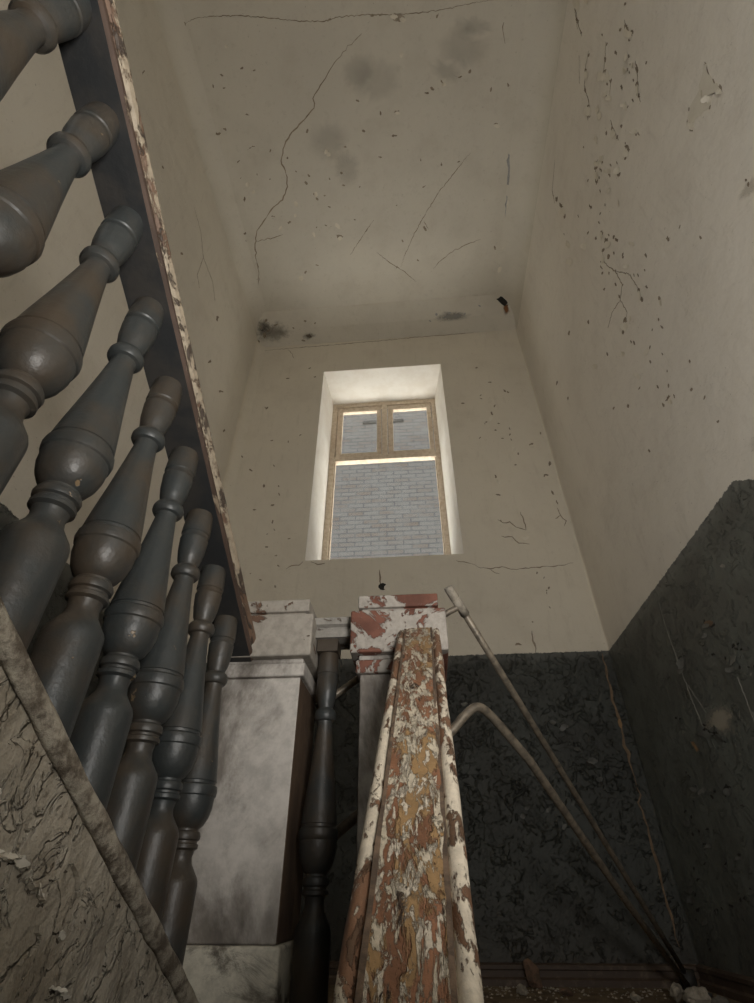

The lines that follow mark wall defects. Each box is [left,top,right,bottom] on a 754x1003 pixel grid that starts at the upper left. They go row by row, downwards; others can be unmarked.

crack [184,0,488,283]
crack [602,252,638,327]